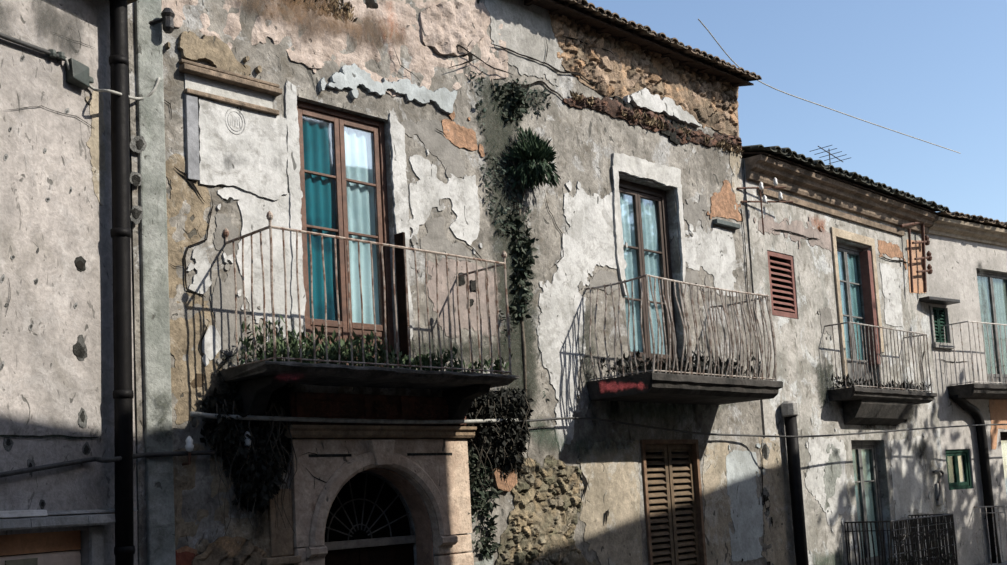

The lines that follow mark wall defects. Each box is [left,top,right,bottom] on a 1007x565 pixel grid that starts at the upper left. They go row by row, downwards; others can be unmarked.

peeling [161,0,563,157]
crack [445,35,715,148]
spalling [562,88,742,158]
peeling [186,224,212,294]
peeling [216,186,303,342]
peeling [684,180,756,297]
peeling [189,325,226,388]
peeling [536,180,643,565]
flaking render [490,467,518,492]
peeling [702,438,774,565]